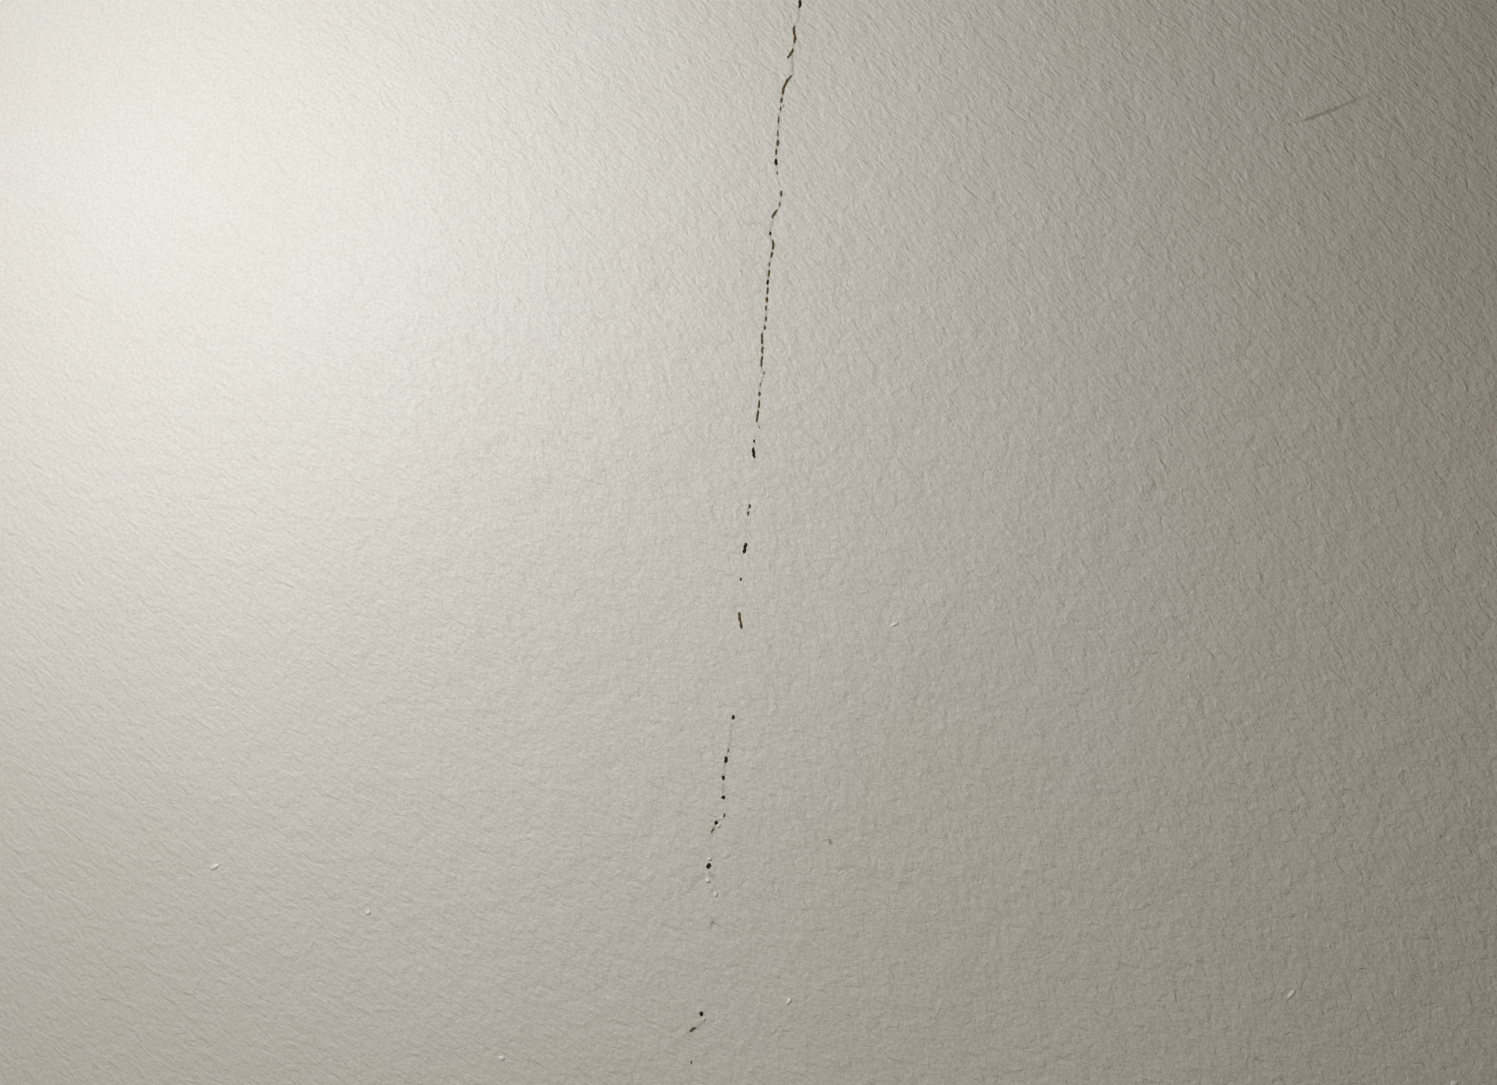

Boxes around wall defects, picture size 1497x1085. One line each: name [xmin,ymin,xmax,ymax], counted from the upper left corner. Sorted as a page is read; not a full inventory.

crack [752,0,802,458]
crack [738,504,751,629]
crack [705,715,735,897]